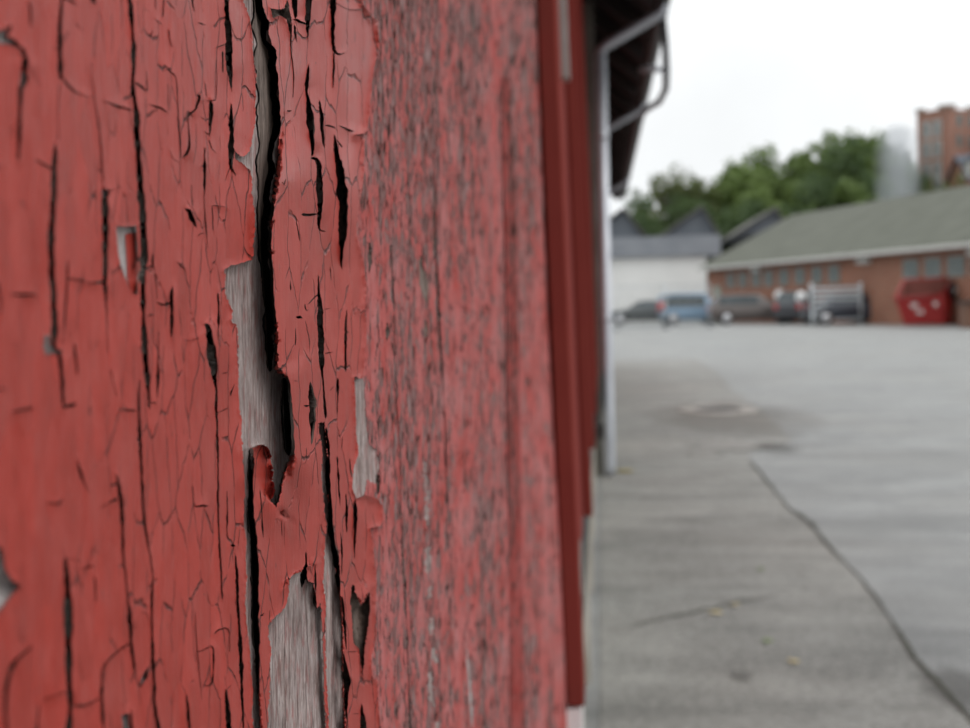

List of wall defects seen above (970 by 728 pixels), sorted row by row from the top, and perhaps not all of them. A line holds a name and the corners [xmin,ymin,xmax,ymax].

crack [6,36,109,408]
peeling [116,226,138,294]
crack [53,0,234,228]
crack [287,68,350,243]
crack [287,0,359,72]
peeling [0,552,19,608]
crack [106,174,173,556]
crack [195,301,244,728]
peeling [224,0,372,728]
crack [296,290,347,424]
crack [339,599,366,728]
peeling [352,377,380,498]